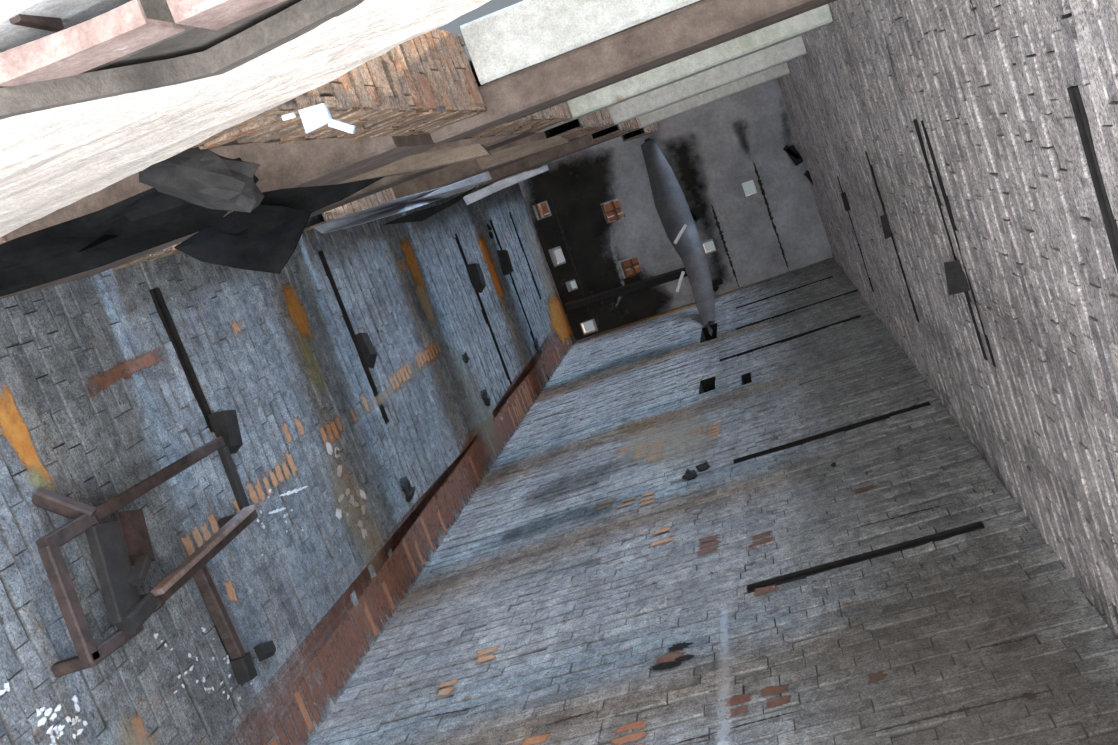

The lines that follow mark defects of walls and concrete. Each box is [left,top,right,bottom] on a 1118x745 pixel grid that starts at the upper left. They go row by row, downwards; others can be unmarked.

water stain [667,141,727,279]
peeling [181,513,219,556]
peeling [231,333,573,745]
peeling [223,579,238,602]
peeling [174,653,241,701]
peeling [611,720,648,745]